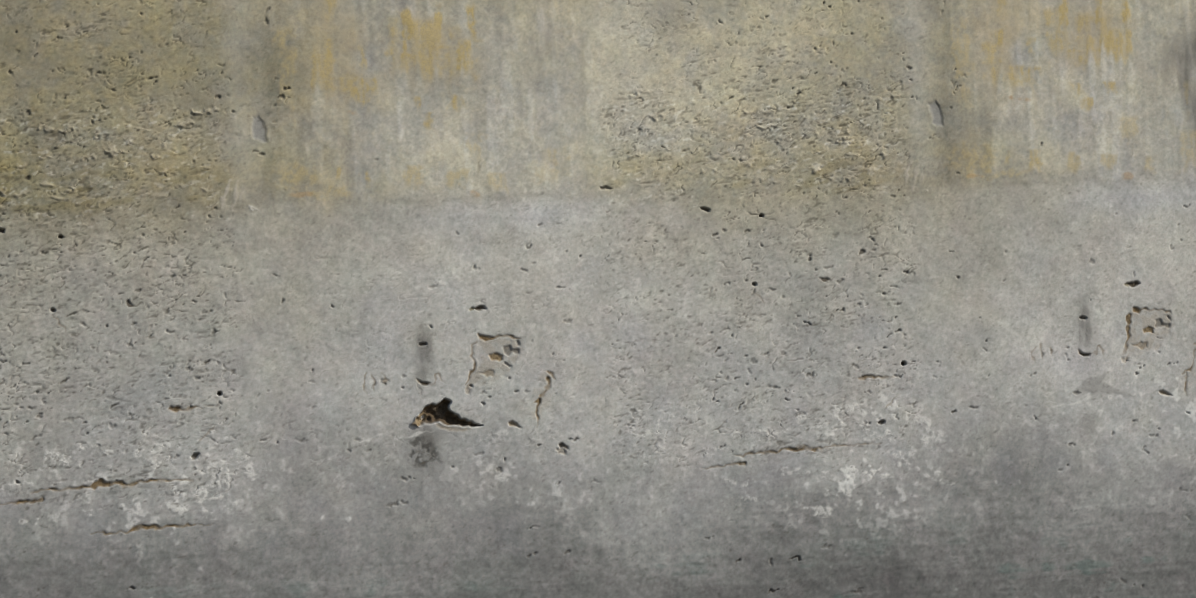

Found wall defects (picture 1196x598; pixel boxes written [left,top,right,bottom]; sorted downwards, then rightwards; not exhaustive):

water stain [1142,4,1196,130]
spalling [1120,305,1177,365]
spalling [409,331,526,433]
crack [699,441,883,470]
crack [0,477,195,507]
crack [89,521,215,537]